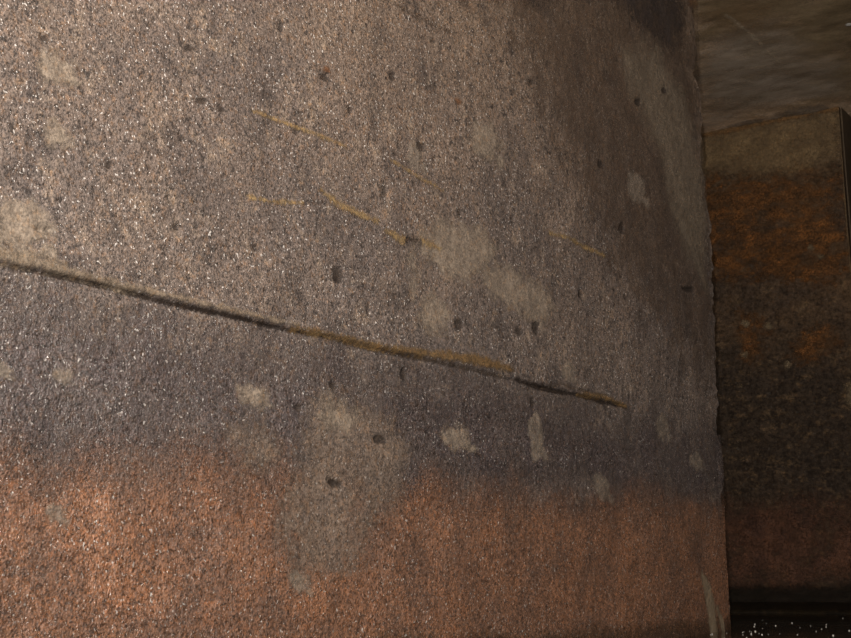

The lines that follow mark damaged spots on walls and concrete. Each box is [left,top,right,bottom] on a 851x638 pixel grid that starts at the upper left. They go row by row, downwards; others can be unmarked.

crack [0,247,627,408]
rust [0,448,731,638]